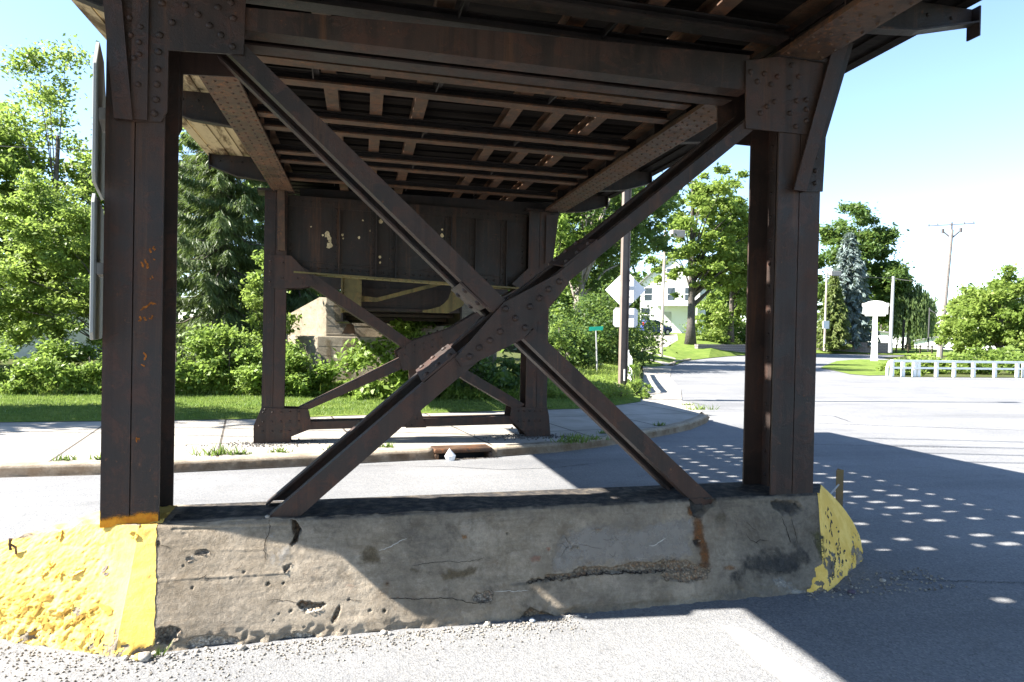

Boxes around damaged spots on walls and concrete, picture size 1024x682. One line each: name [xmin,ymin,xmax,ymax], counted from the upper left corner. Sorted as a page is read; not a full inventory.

spalling [290,520,301,545]
corrosion [688,506,709,568]
peeling [819,508,847,577]
peeling [14,561,113,647]
spalling [155,626,240,648]
spalling [290,599,349,622]